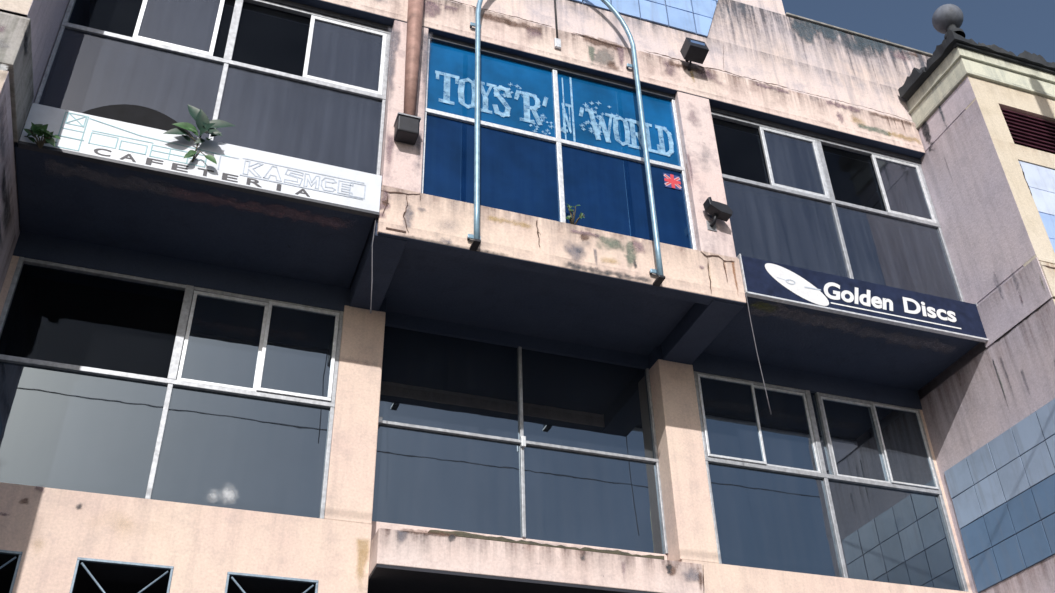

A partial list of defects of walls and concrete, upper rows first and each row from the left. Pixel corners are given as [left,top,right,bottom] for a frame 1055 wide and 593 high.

water stain [792,20,917,66]
crack [381,190,421,231]
water stain [568,230,648,281]
crack [701,251,735,294]
water stain [398,529,455,541]